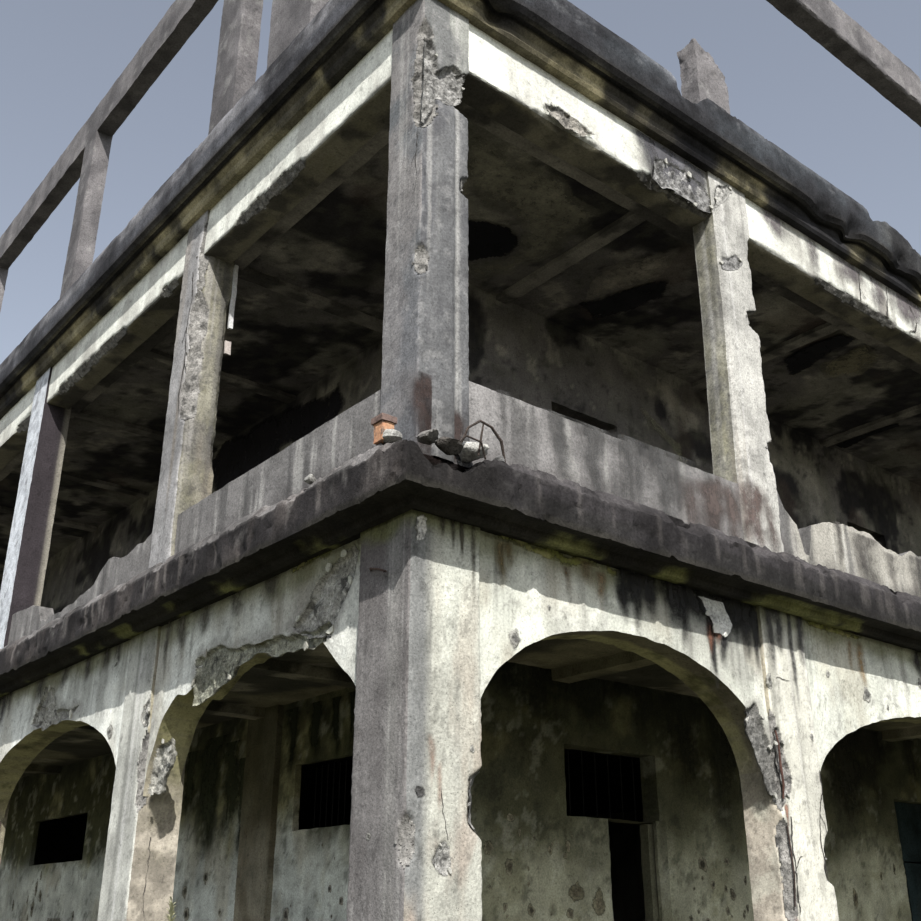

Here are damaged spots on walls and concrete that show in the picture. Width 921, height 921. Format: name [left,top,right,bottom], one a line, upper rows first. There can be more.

spalling [411,18,468,127]
spalling [545,102,594,136]
spalling [637,157,732,218]
water stain [468,220,519,261]
water stain [548,410,568,475]
water stain [581,422,682,516]
water stain [855,534,874,575]
spalling [191,544,359,706]
water stain [617,568,803,684]
flaking render [699,596,732,637]
water stain [183,735,246,849]
spalling [744,703,799,921]